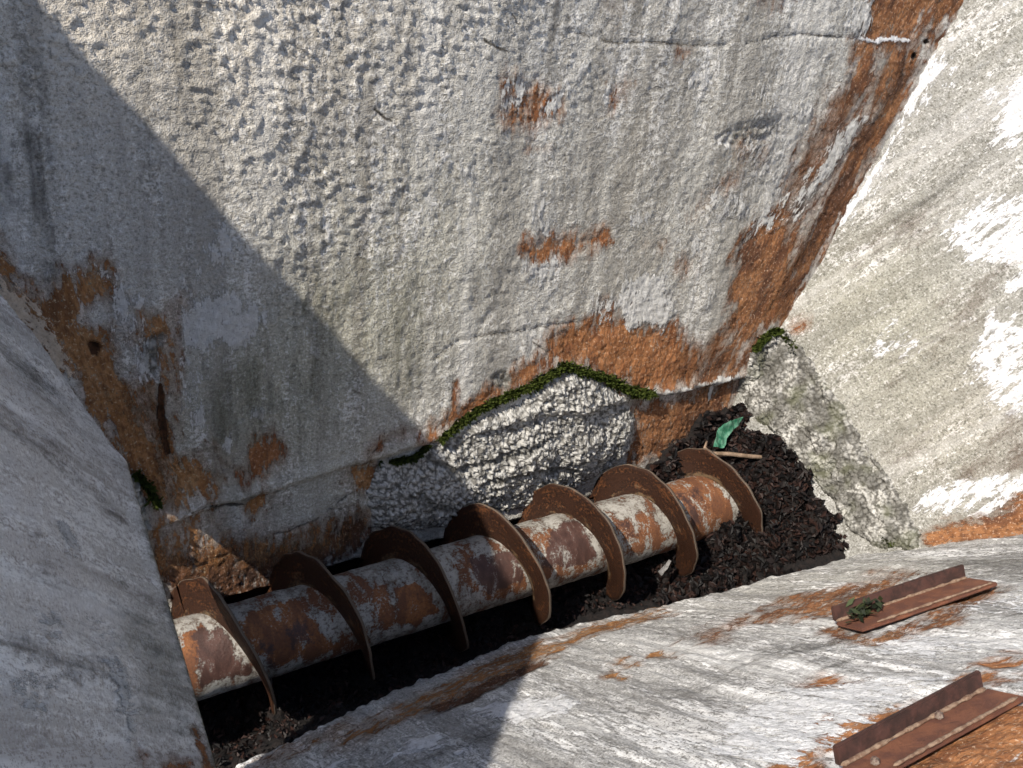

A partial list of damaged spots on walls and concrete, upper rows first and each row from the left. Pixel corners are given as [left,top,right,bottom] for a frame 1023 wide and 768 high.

crack [577,33,717,46]
rust [417,0,964,466]
rust [0,245,388,603]
crack [192,503,244,514]
rust [922,493,1023,547]
rust [696,569,1000,646]
rust [252,606,681,768]
rust [805,673,858,689]
rust [952,651,1023,687]
rust [163,726,214,768]
rust [767,707,903,768]
rust [905,705,1023,768]